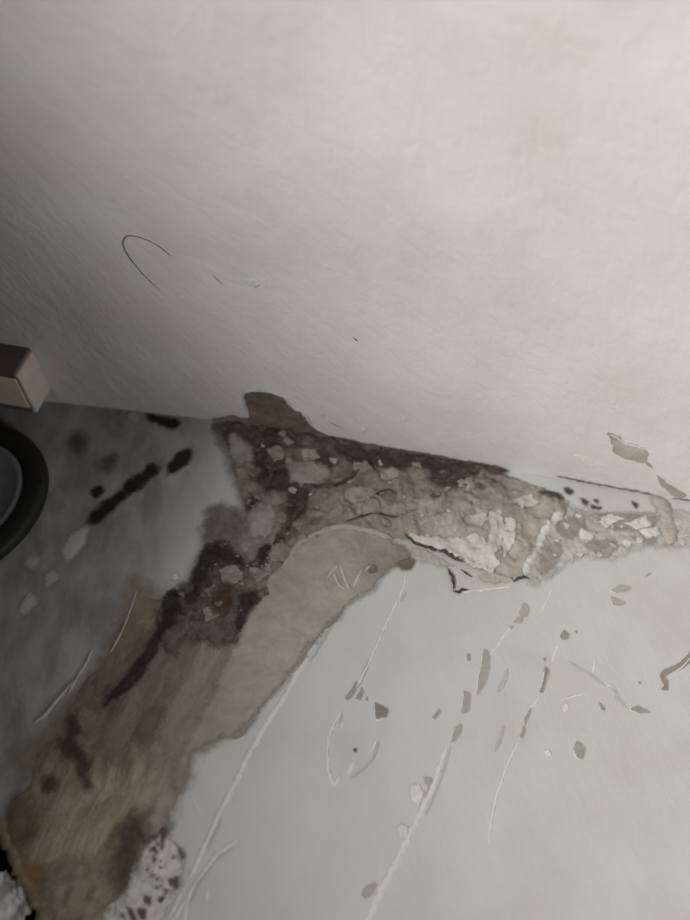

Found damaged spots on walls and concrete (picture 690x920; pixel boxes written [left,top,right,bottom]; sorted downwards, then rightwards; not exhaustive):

water stain [146,414,180,429]
flaking render [212,390,661,593]
peeling [608,433,686,498]
peeling [509,602,530,629]
peeling [610,585,631,606]
water stain [8,426,283,920]
water stain [209,605,345,746]
peeling [344,682,389,721]
peeling [451,649,490,742]
peeling [540,658,549,693]
peeling [574,741,586,759]
peeling [96,827,185,920]